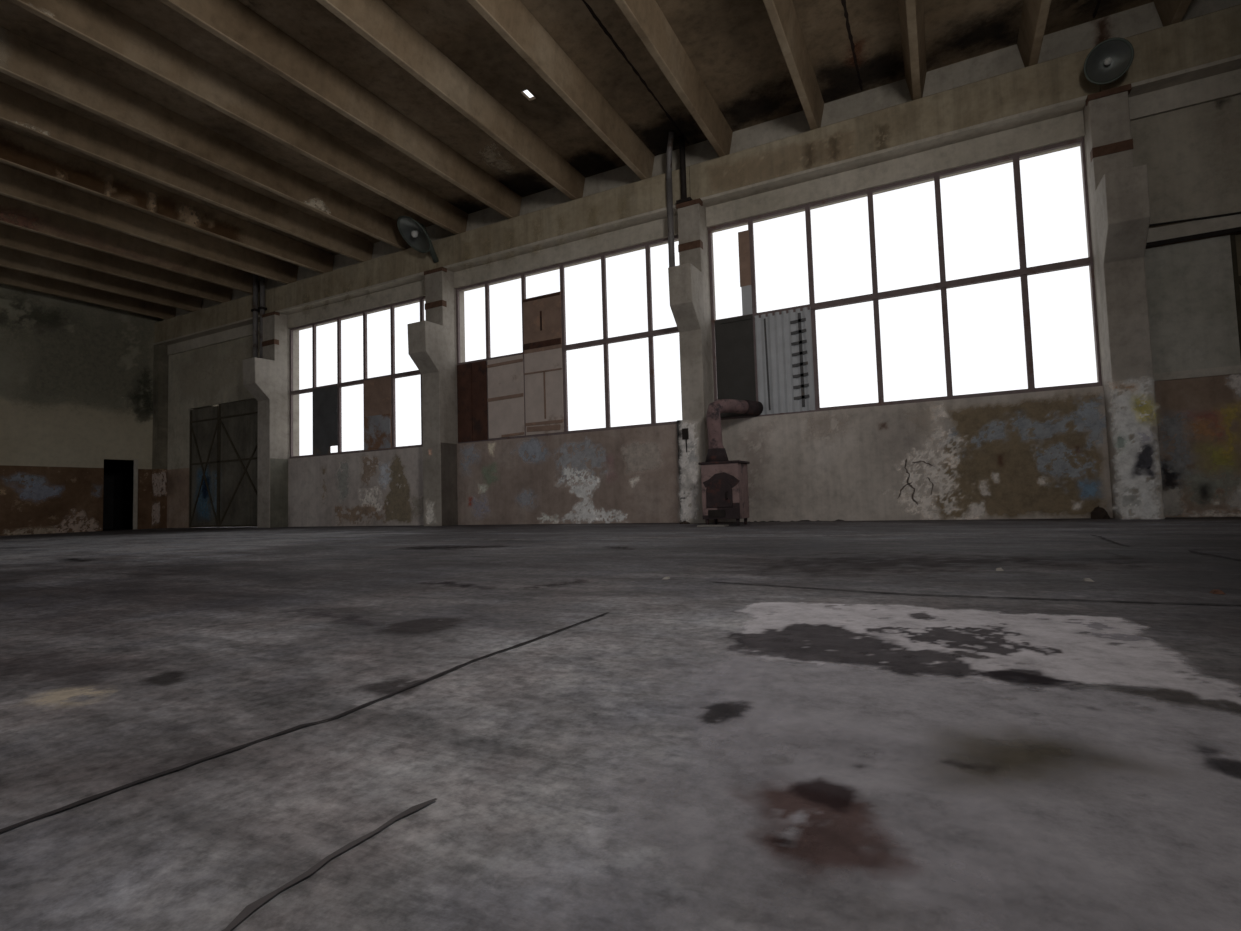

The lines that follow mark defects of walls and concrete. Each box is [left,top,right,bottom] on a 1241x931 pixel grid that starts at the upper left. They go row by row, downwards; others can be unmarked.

peeling [7,511,98,535]
peeling [323,455,434,524]
peeling [540,468,627,523]
peeling [680,423,697,518]
peeling [901,381,1182,520]
peeling [629,602,1241,931]